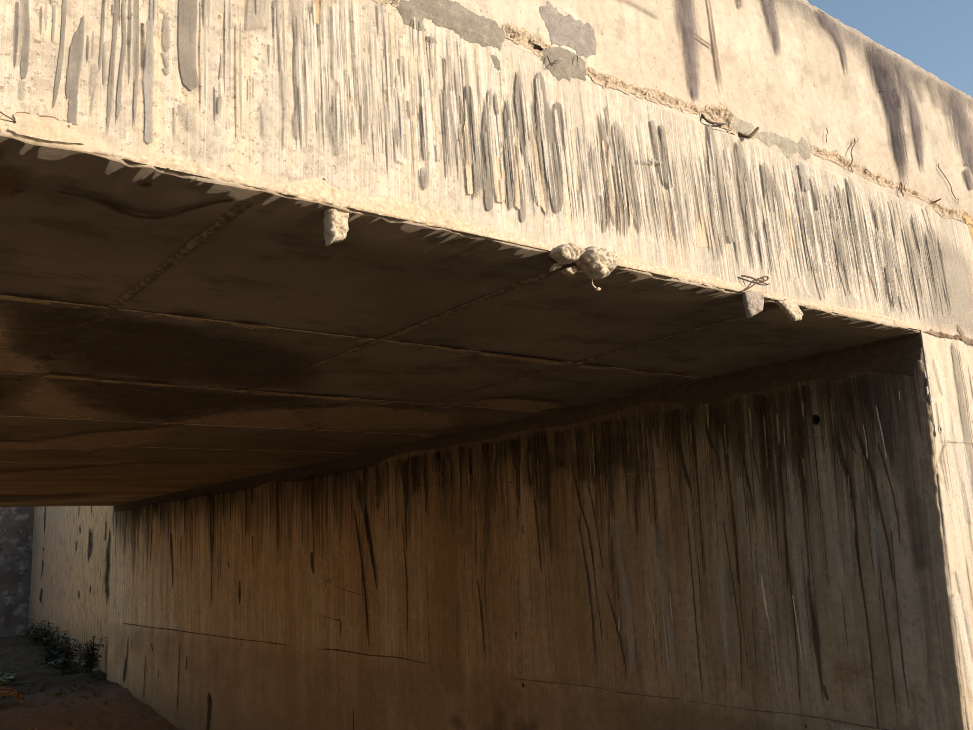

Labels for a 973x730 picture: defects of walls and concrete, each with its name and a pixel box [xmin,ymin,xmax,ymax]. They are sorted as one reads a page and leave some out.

damp [18,0,30,99]
damp [44,0,210,143]
spalling [8,99,553,251]
damp [218,0,973,332]
spalling [549,262,580,276]
crack [927,325,973,346]
damp [935,342,973,524]
damp [0,312,922,730]
damp [954,573,973,696]